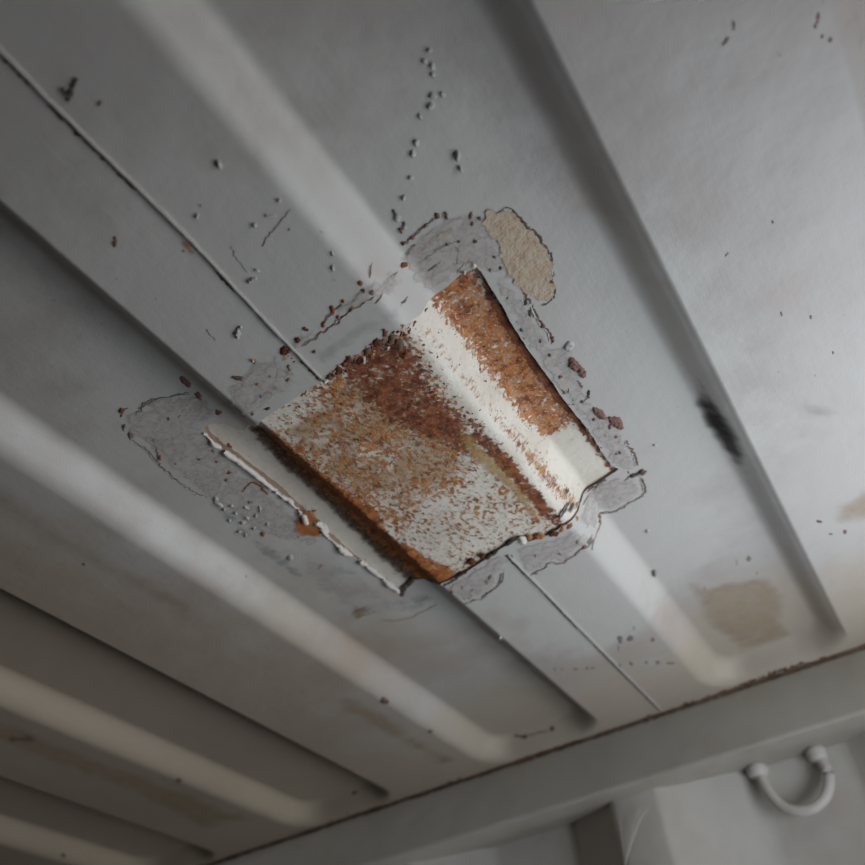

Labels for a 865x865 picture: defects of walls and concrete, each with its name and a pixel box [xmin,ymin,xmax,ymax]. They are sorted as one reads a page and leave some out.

corrosion [251,269,615,586]
peeling [227,207,647,605]
corrosion [592,407,624,430]